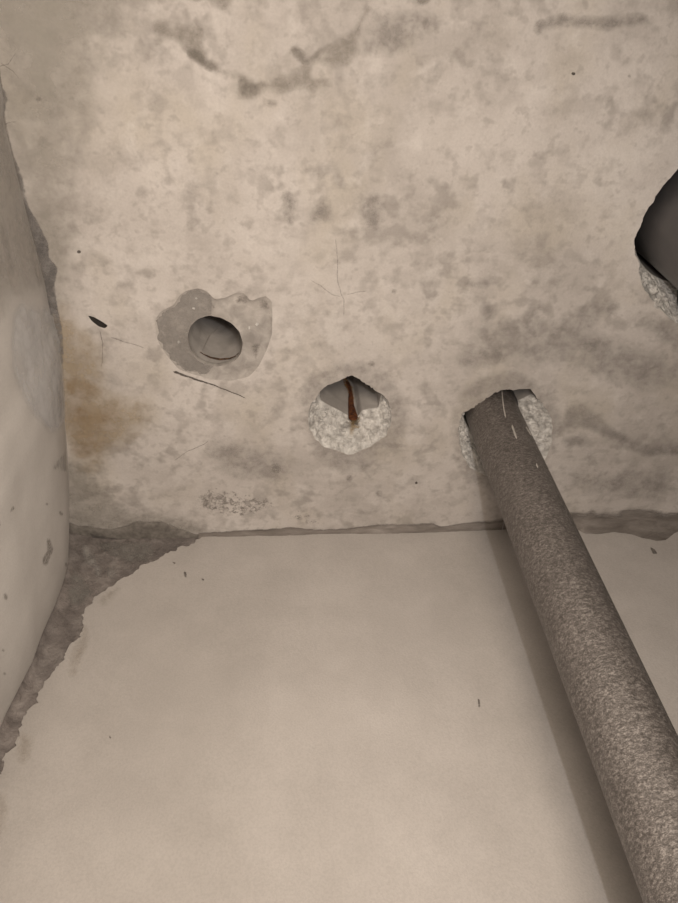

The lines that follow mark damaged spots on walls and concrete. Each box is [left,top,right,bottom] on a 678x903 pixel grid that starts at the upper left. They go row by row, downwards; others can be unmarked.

spalling [634,244,678,323]
spalling [155,289,272,380]
spalling [308,376,392,455]
corrosion [343,378,359,428]
spalling [458,412,487,476]
spalling [505,389,552,460]
peeling [0,521,198,774]